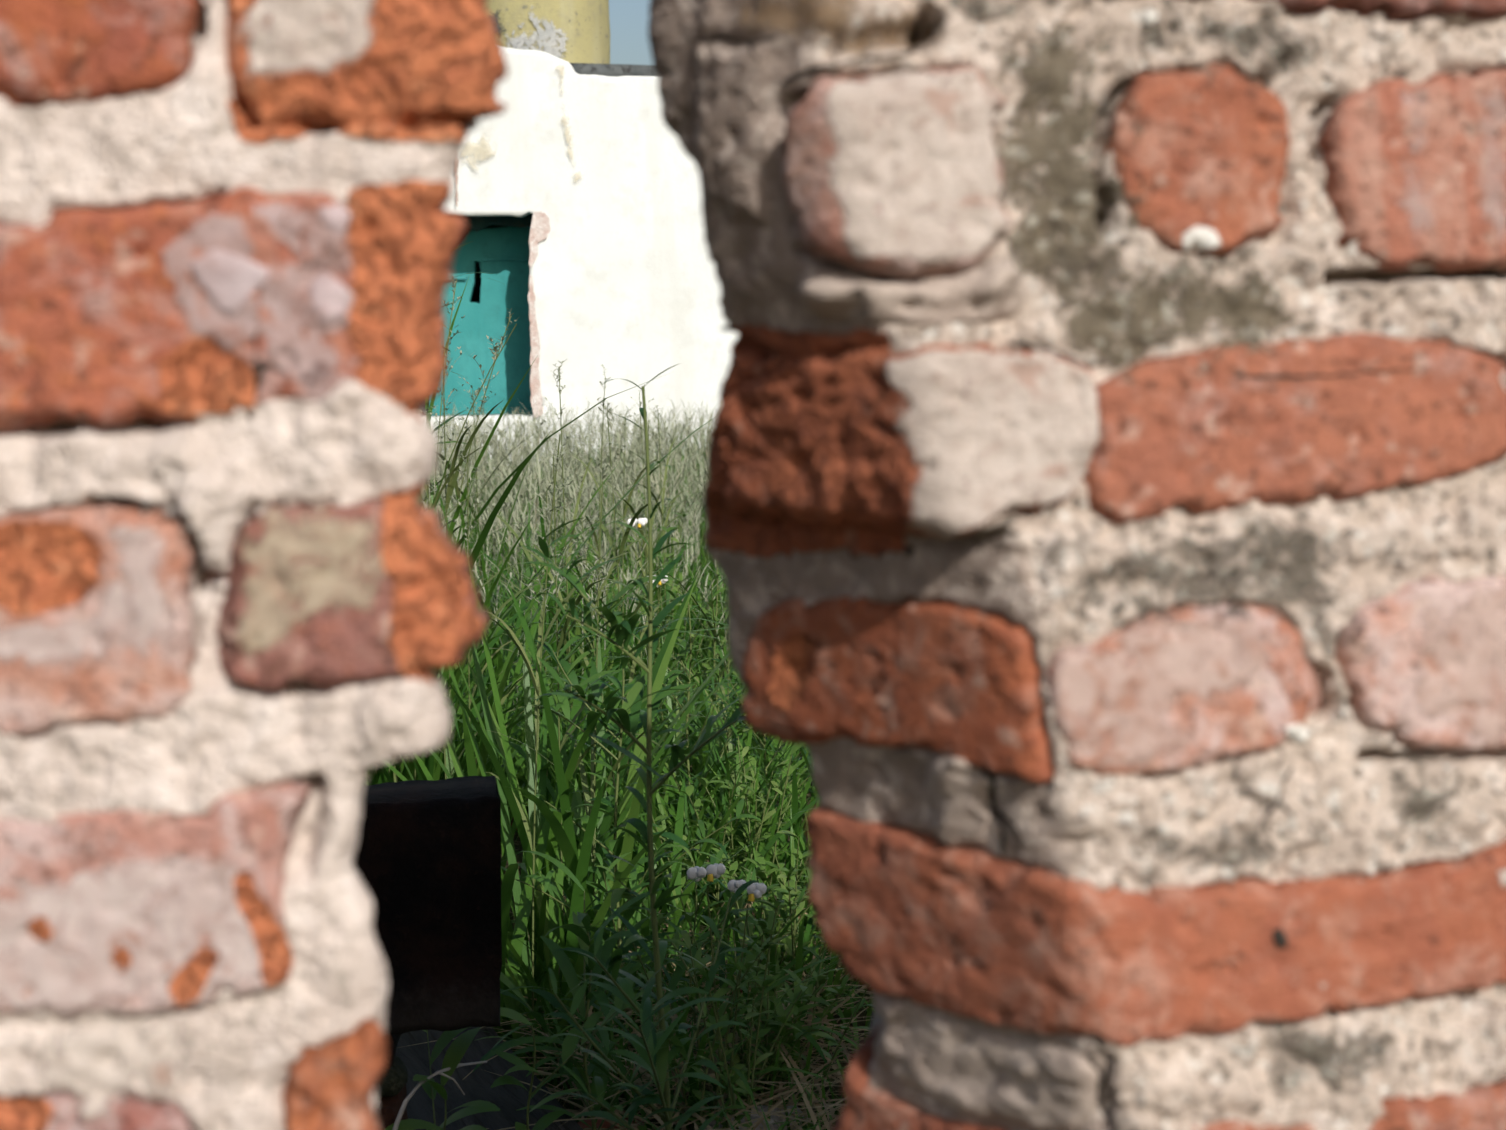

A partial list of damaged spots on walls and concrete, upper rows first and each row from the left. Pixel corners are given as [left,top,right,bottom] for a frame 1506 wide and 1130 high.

crack [978,763,1022,856]